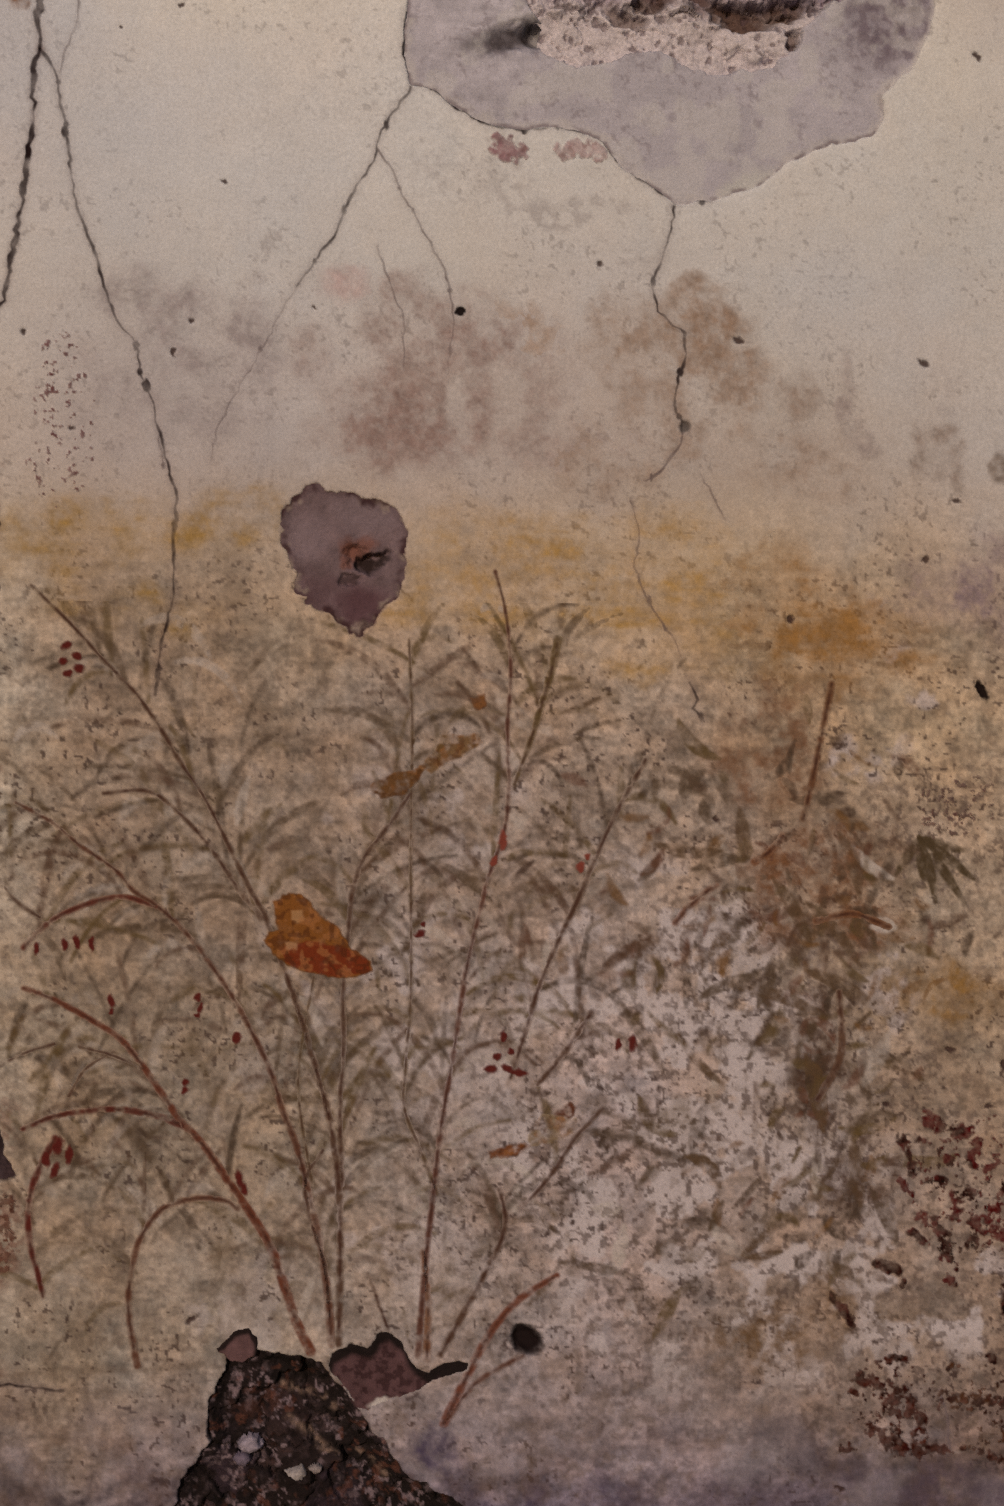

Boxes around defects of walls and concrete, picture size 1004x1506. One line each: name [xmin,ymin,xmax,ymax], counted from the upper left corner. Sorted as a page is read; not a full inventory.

spalling [404,0,934,205]
spalling [970,50,983,63]
crack [0,0,180,697]
crack [209,11,726,723]
spalling [280,483,408,637]
crack [0,1134,16,1179]
peeling [0,1192,19,1273]
crack [0,1381,66,1394]
spalling [175,1328,468,1506]